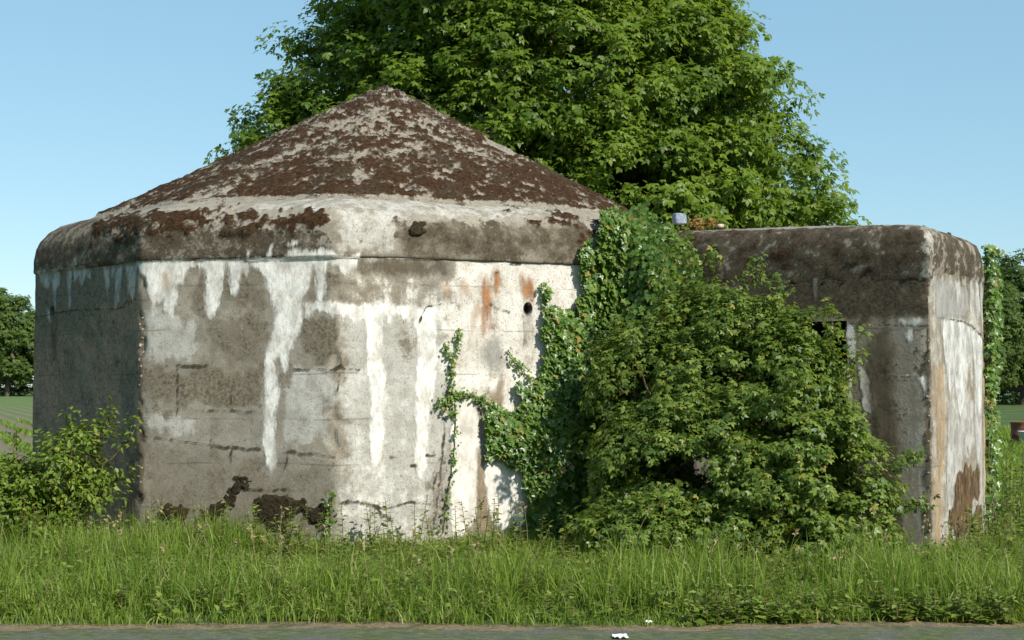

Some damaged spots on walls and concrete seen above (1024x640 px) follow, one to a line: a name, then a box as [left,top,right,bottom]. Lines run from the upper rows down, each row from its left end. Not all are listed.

water stain [38,268,90,357]
corrosion [483,271,499,330]
corrosion [522,277,534,298]
water stain [104,241,446,479]
peeling [949,463,982,537]